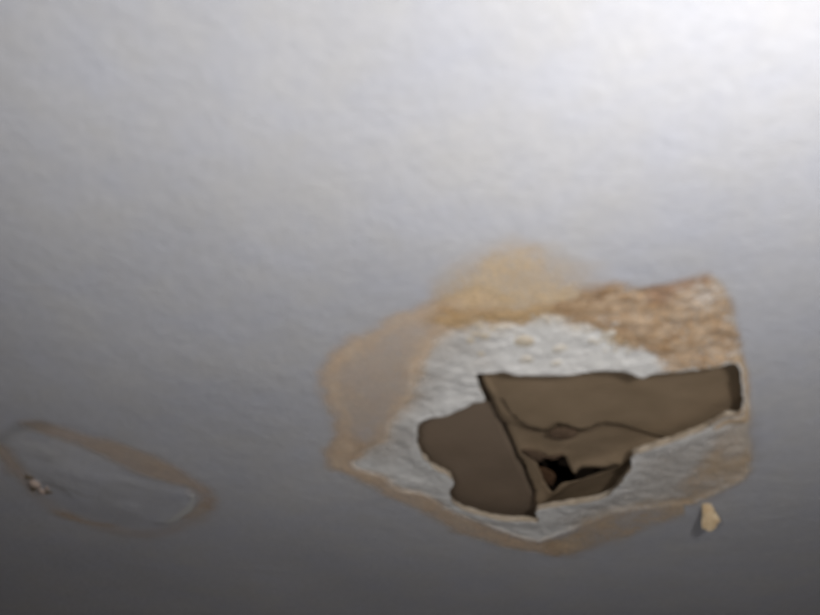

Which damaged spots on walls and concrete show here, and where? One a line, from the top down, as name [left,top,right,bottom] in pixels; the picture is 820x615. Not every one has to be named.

leakage [322,251,750,555]
spalling [349,275,752,542]